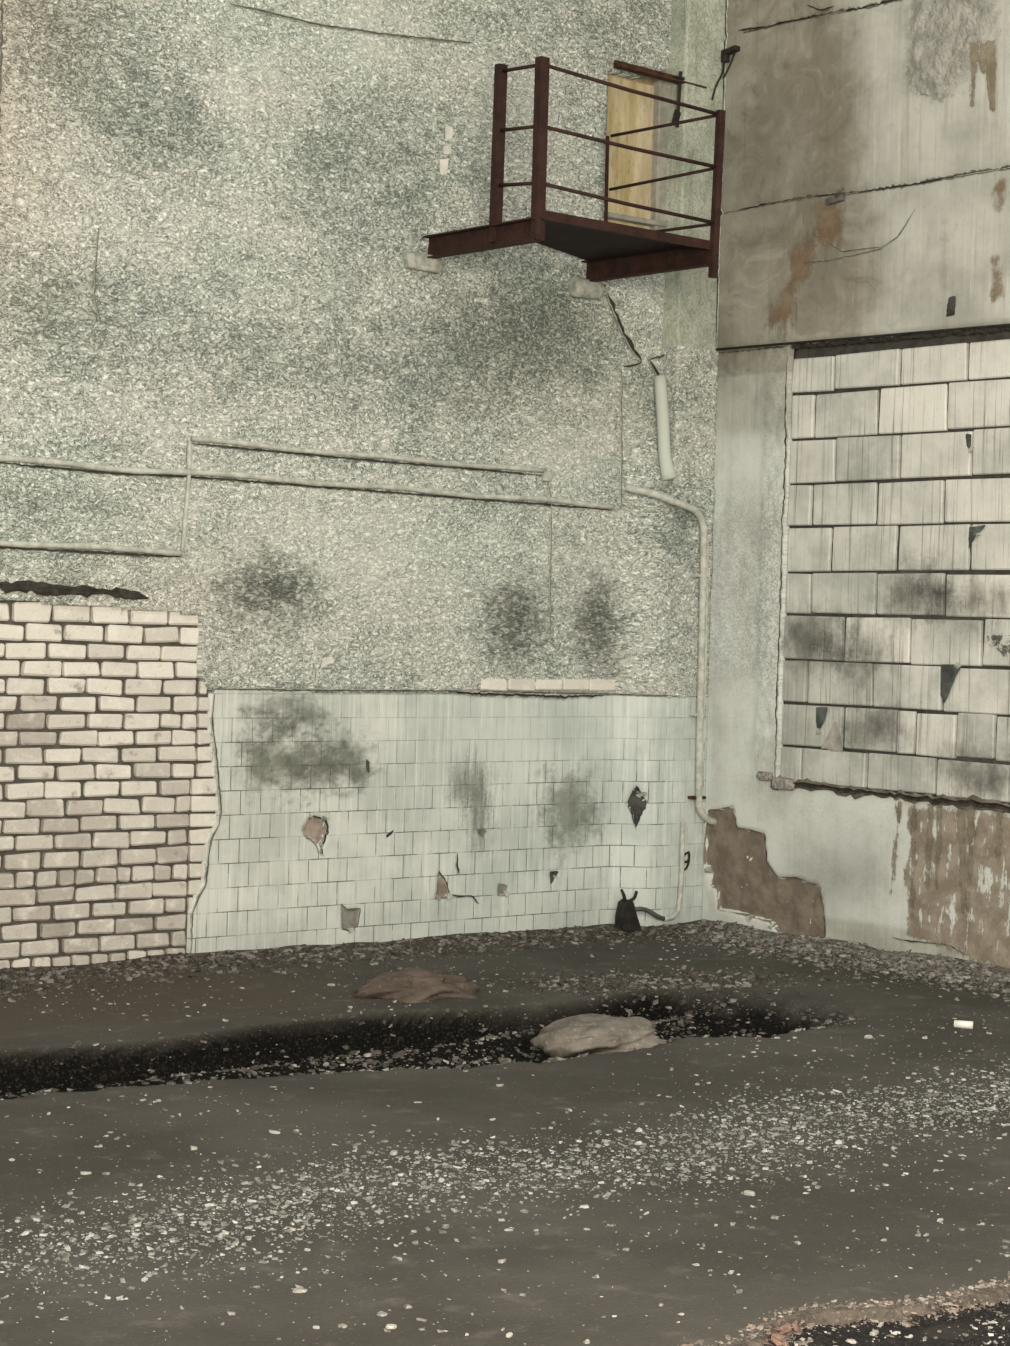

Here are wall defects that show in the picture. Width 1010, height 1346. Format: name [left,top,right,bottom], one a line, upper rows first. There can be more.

crack [233,4,472,43]
crack [0,0,8,131]
peeling [970,40,997,111]
crack [606,292,665,510]
crack [218,688,707,700]
damp [247,741,367,783]
spalling [627,786,649,829]
spalling [302,815,329,854]
crack [452,854,479,904]
spalling [704,806,826,938]
peeling [891,801,1010,968]
spalling [341,904,361,933]